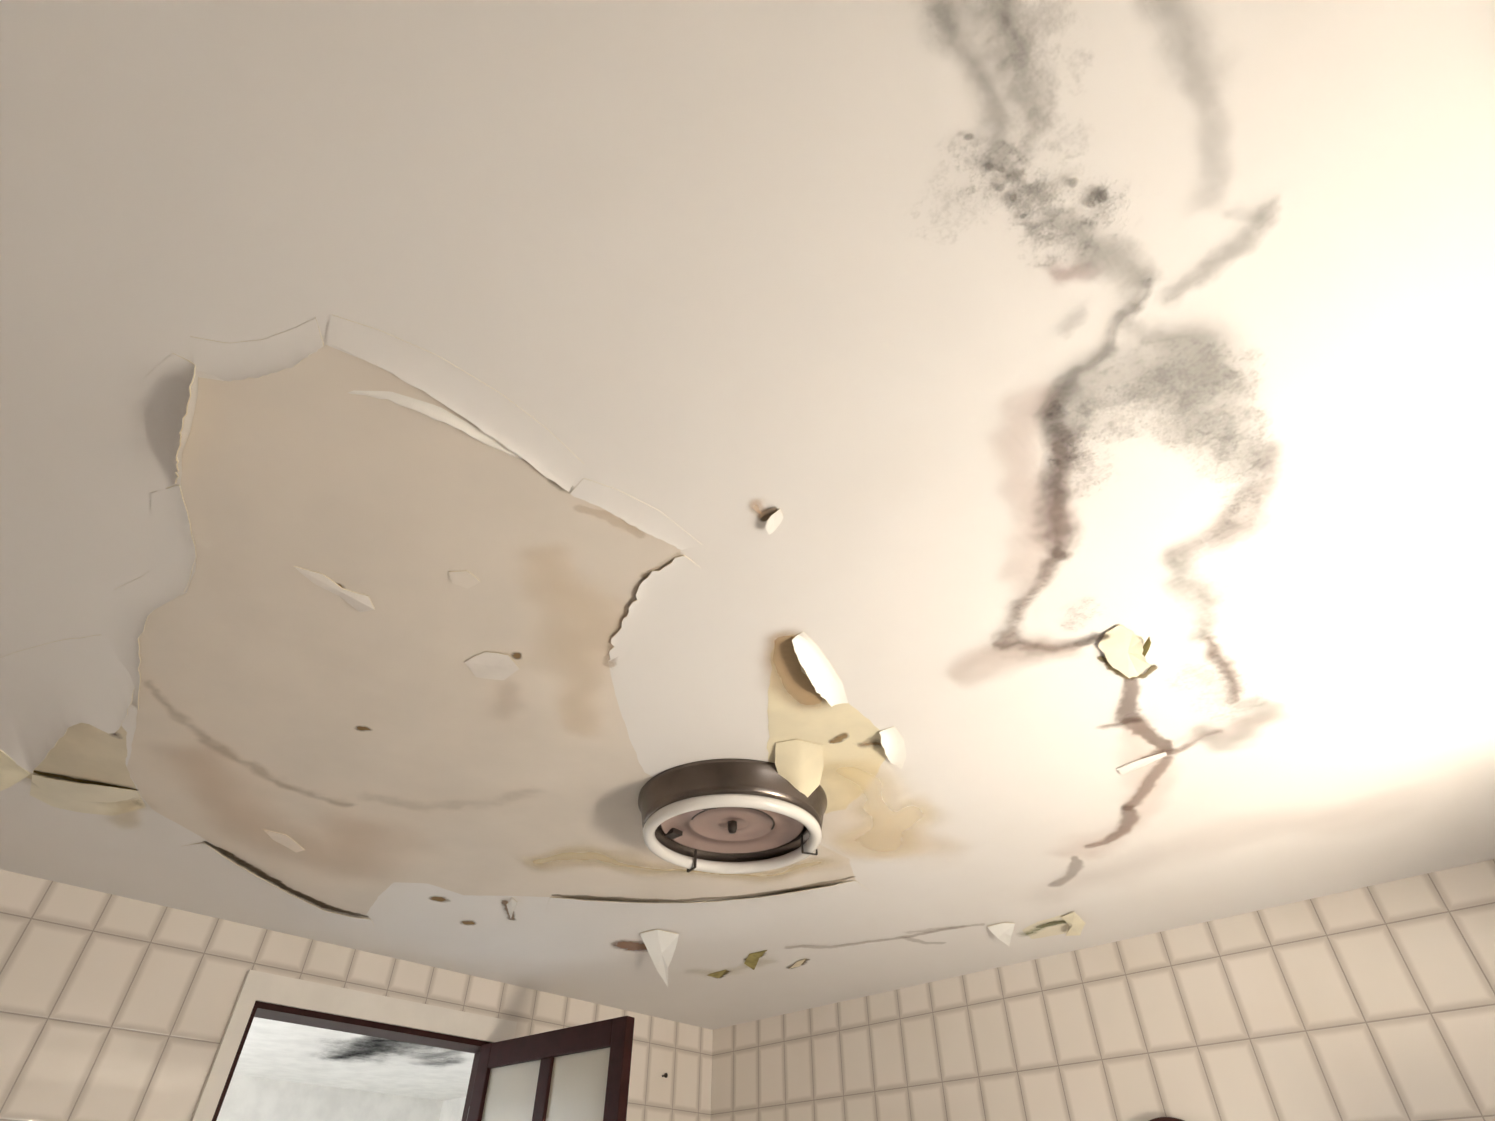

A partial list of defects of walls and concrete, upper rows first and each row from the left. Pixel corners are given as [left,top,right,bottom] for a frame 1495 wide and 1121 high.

peeling [0,315,869,987]
peeling [767,632,906,814]
peeling [1098,625,1157,679]
damp [1210,645,1238,702]